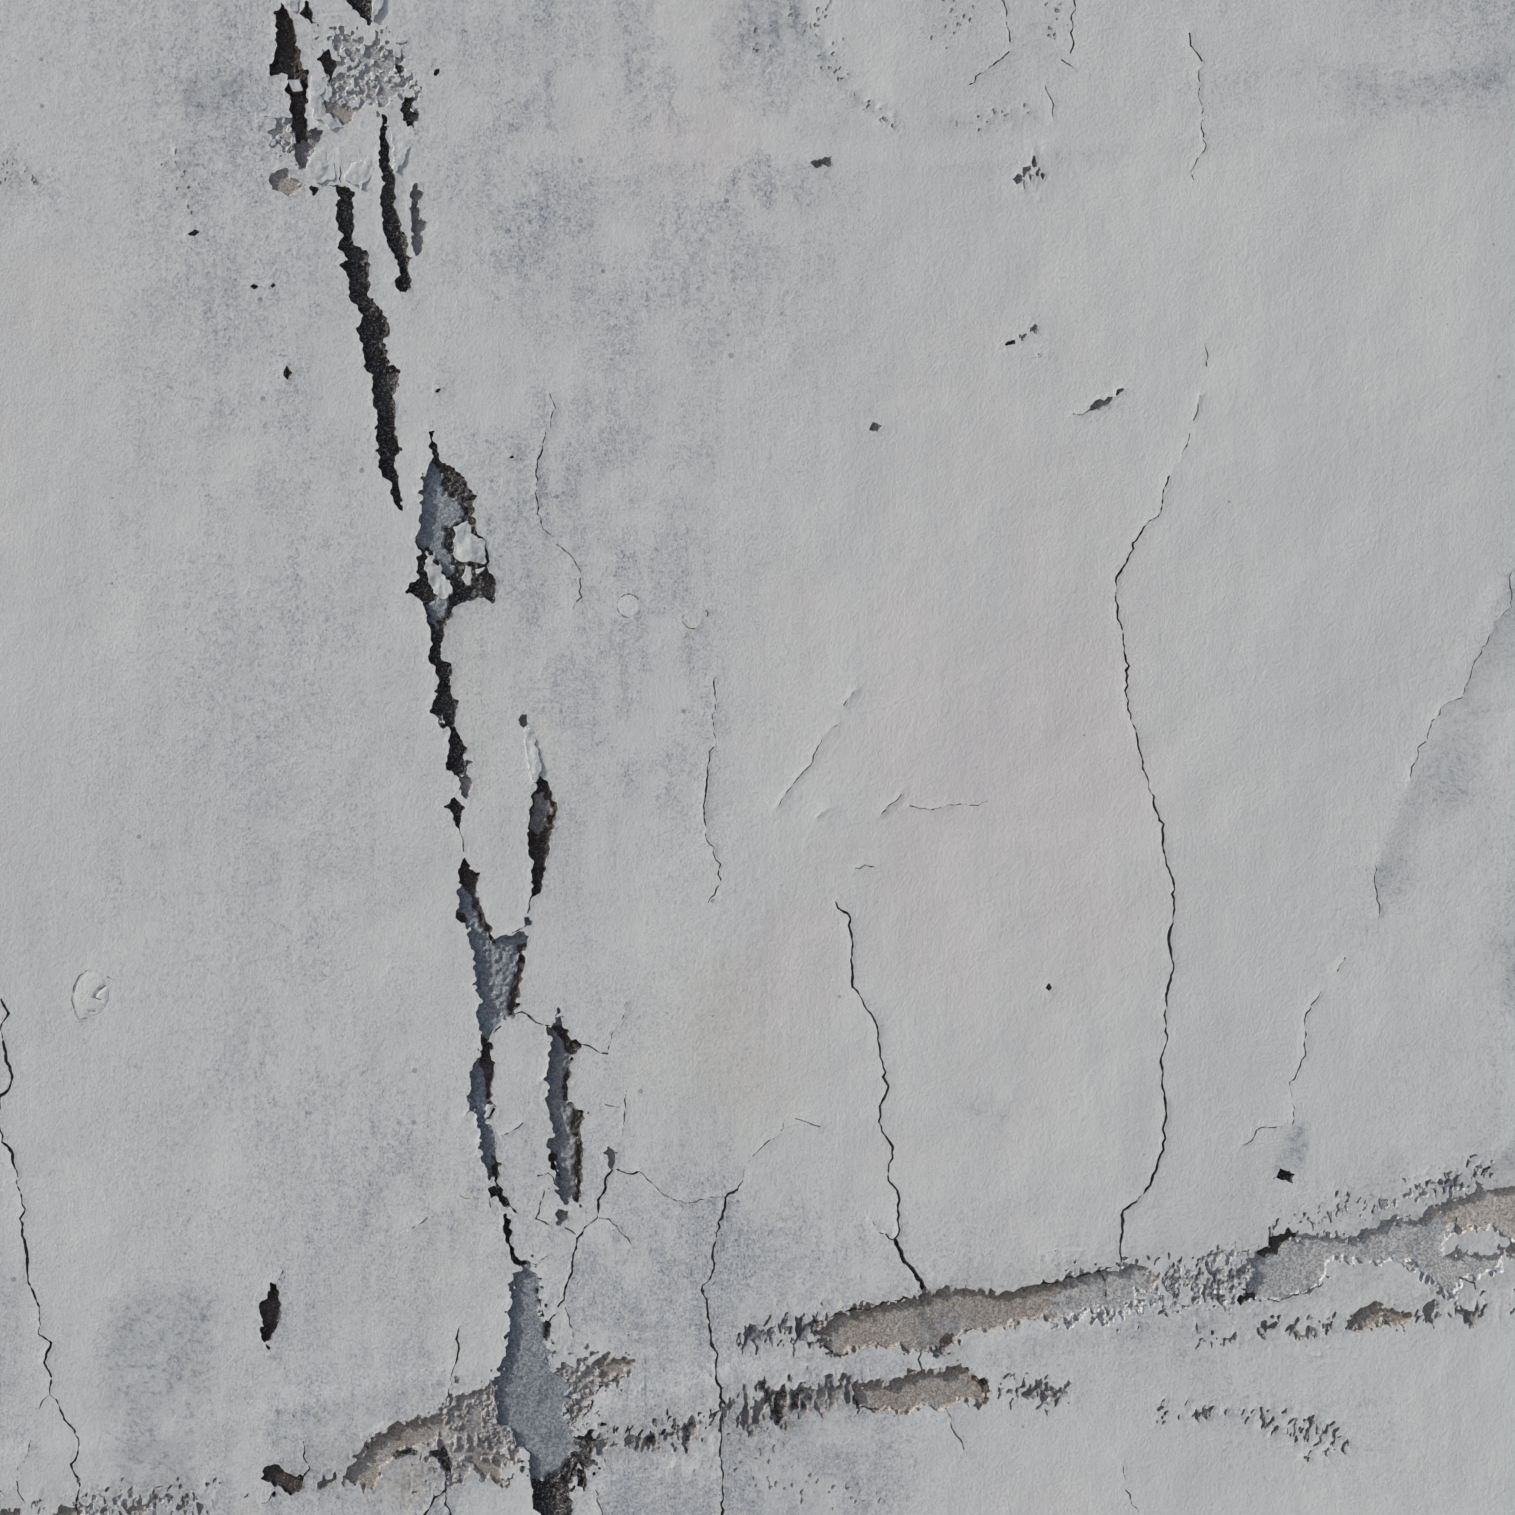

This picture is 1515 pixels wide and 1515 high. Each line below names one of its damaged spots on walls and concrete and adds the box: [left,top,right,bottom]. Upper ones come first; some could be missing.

peeling [262,0,440,196]
crack [1189,33,1207,180]
crack [881,794,988,815]
crack [1115,347,1209,1261]
spalling [444,714,627,1235]
crack [835,901,926,1290]
crack [0,999,81,1503]
peeling [259,1271,291,1350]
peeling [551,1154,1515,1471]
peeling [0,1477,222,1515]
peeling [244,1369,526,1507]